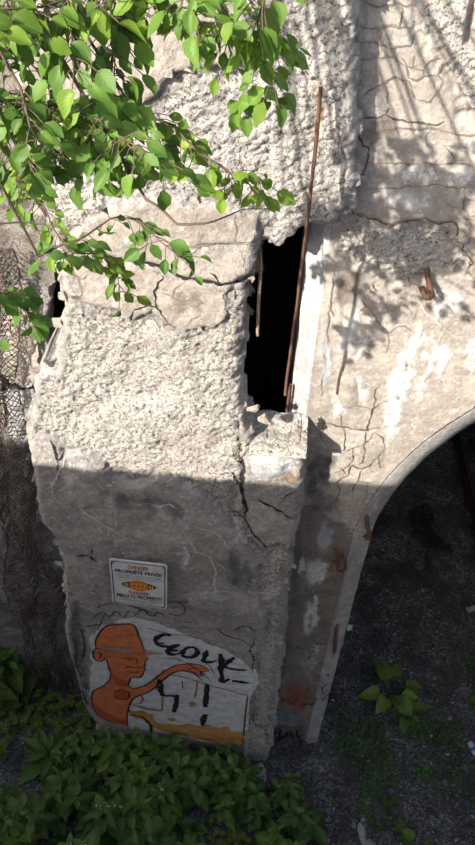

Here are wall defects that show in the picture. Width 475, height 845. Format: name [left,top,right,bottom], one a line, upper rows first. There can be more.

spalling [0,42,18,97]
spalling [133,0,475,294]
crack [351,0,475,282]
crack [74,274,89,299]
crack [104,216,258,331]
crack [321,275,334,396]
crack [355,294,415,354]
crack [417,296,475,348]
spalling [0,130,296,761]
crack [210,421,304,547]
crack [314,384,389,535]